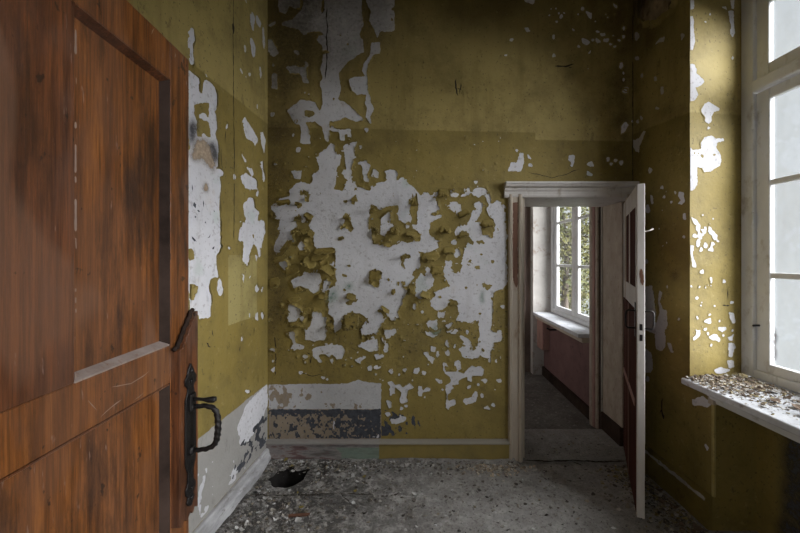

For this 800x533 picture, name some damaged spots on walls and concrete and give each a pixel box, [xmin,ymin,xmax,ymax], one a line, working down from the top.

spalling [576,3,640,55]
peeling [680,0,711,51]
spalling [620,115,646,152]
spalling [568,153,624,178]
peeling [645,63,737,376]
peeling [185,0,533,533]